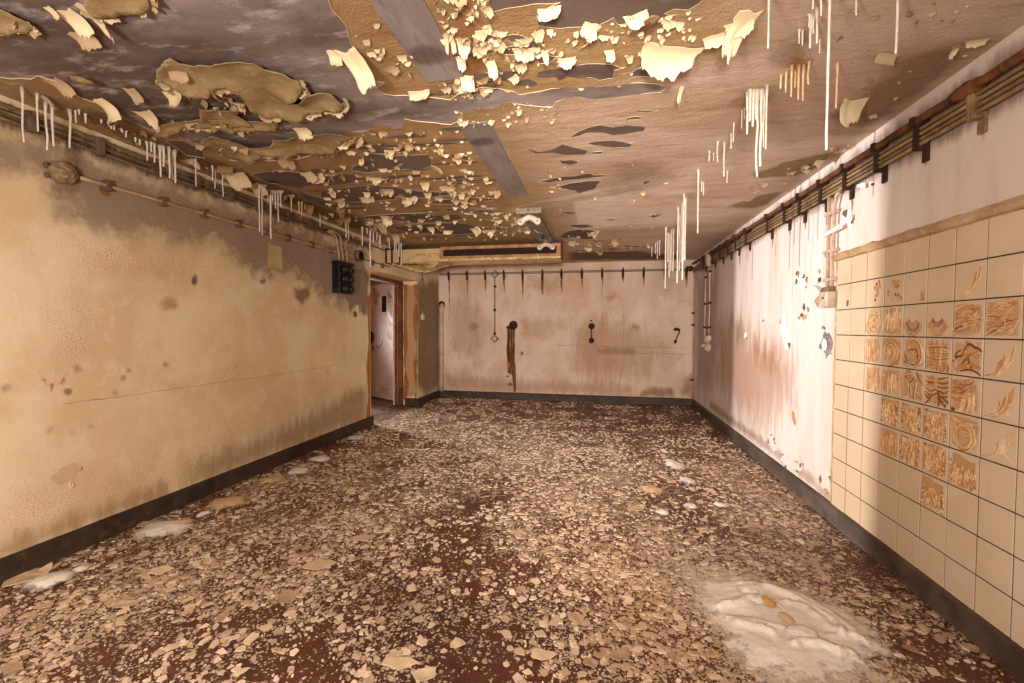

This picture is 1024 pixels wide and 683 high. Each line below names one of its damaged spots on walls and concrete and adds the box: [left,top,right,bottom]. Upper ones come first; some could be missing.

water stain [834,50,950,124]
peeling [0,0,703,244]
water stain [758,154,831,178]
water stain [0,141,369,314]
peeling [559,209,657,256]
water stain [734,193,779,208]
spalling [762,269,821,350]
corrosion [507,329,516,392]
spalling [819,326,833,359]
spalling [767,434,804,471]
water stain [134,496,247,537]
water stain [695,574,896,683]